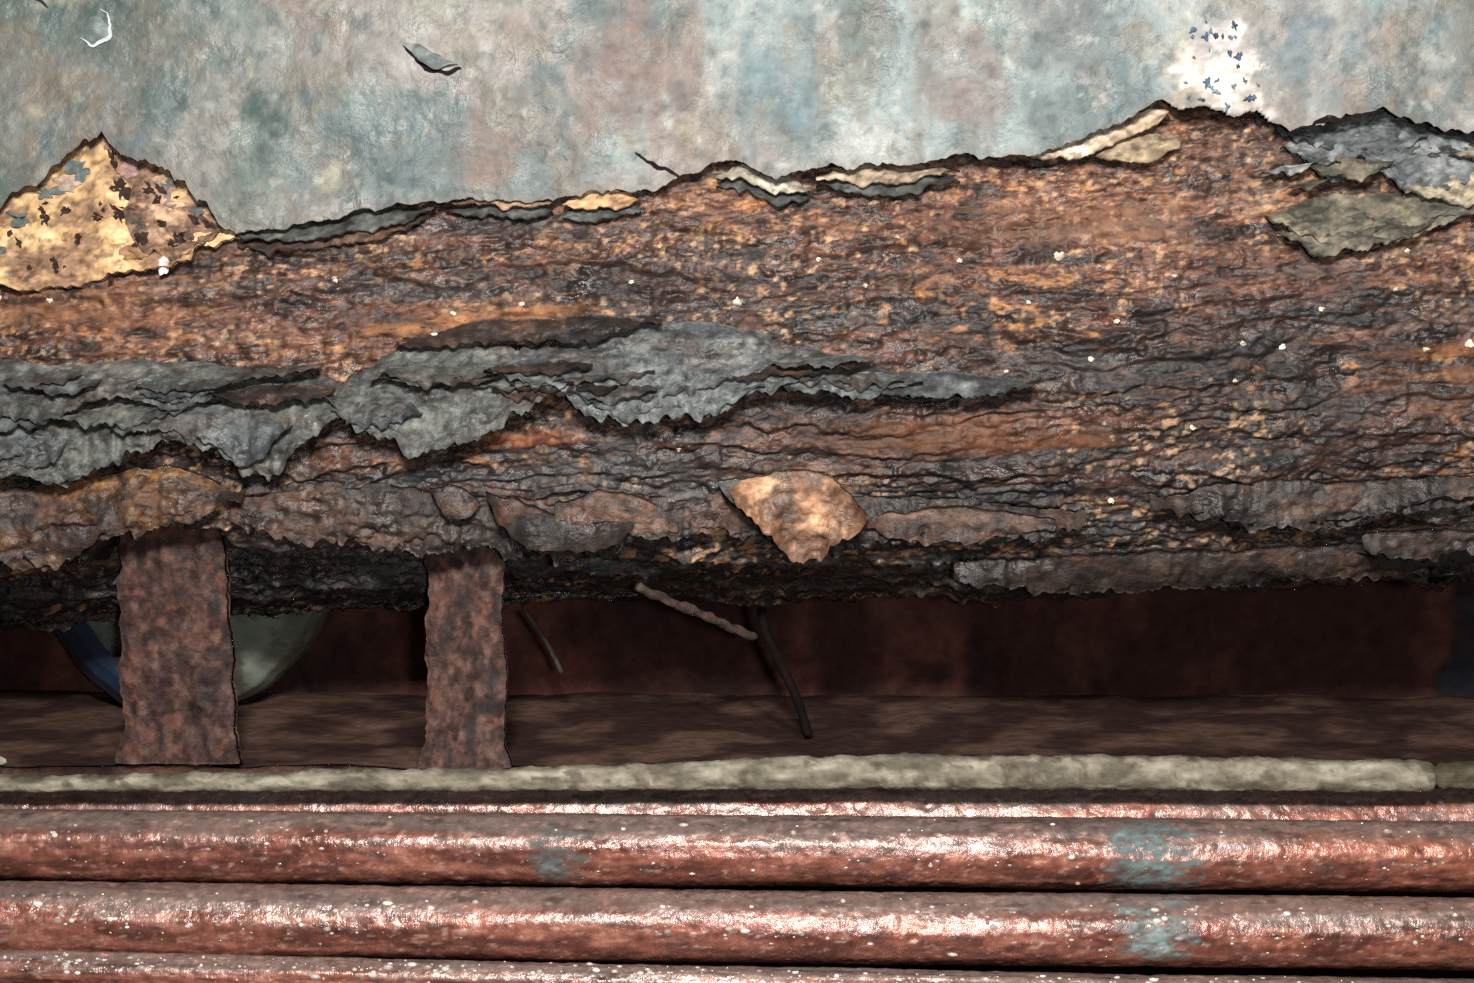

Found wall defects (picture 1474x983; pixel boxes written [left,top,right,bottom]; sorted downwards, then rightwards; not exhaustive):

peeling [1007,17,1474,258]
peeling [0,131,641,292]
rust [367,325,422,334]
rust [440,305,558,330]
peeling [0,314,1037,478]
rust [429,484,635,553]
rust [718,468,868,564]